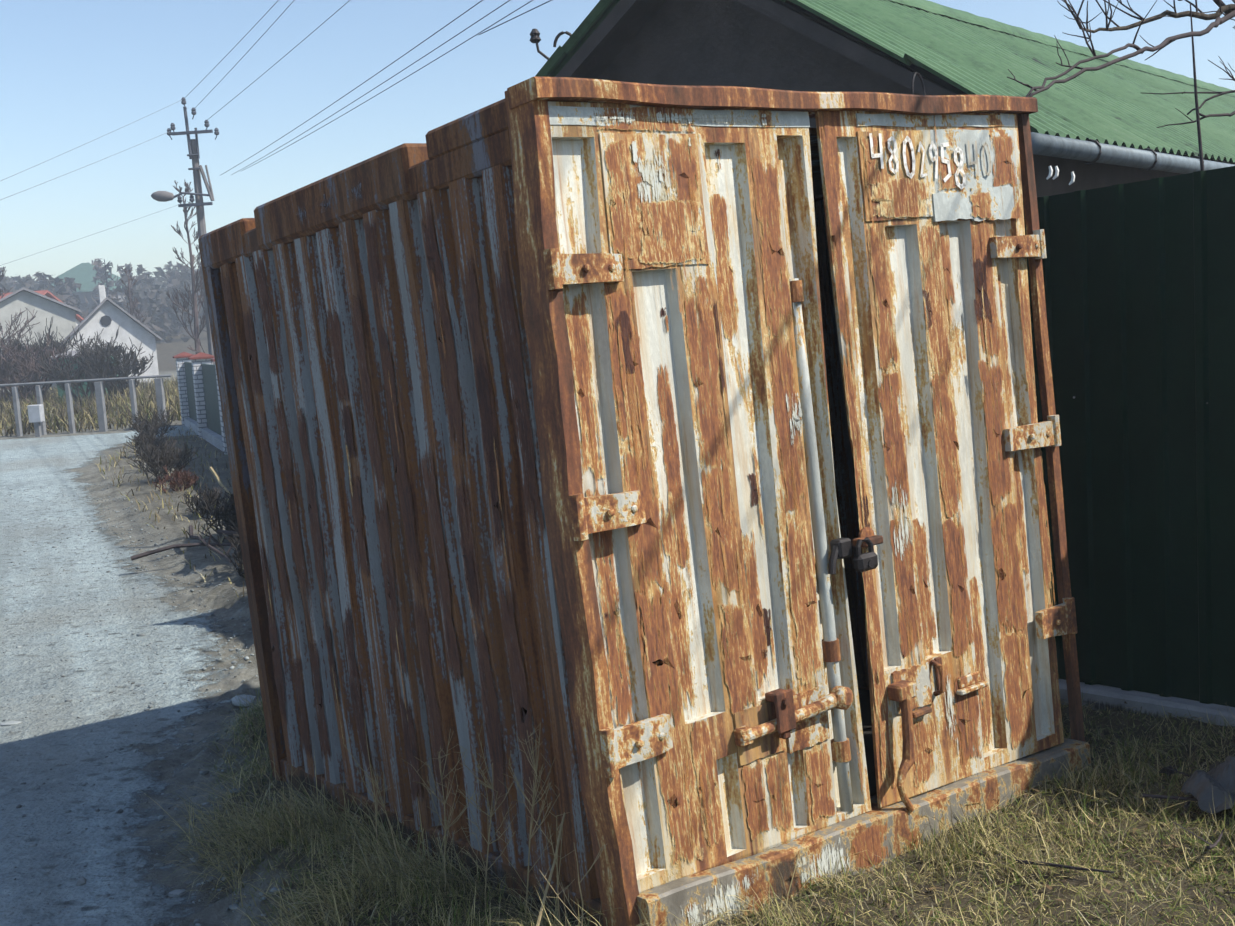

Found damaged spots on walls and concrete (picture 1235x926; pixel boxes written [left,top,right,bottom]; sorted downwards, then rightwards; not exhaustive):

peeling [630,141,673,203]
peeling [587,110,782,146]
rust [220,257,372,778]
rust [565,292,606,497]
rust [590,106,776,866]
rust [750,158,822,693]
peeling [786,393,803,444]
rust [822,116,870,530]
peeling [892,480,914,560]
rust [861,116,1055,788]
rust [742,753,792,840]
rust [806,743,835,824]